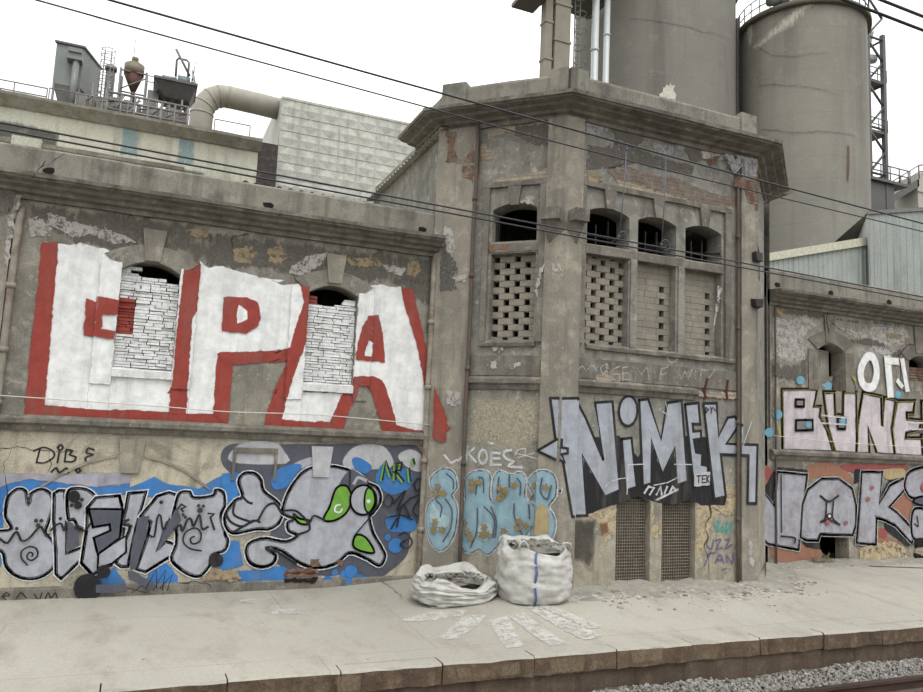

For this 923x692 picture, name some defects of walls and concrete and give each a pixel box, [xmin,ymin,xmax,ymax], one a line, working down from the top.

peeling [659,83,676,100]
flaking render [445,123,548,182]
peeling [585,122,758,211]
peeling [4,195,22,267]
peeling [28,204,136,244]
flaking render [233,245,327,276]
flaking render [347,257,421,278]
peeling [772,308,821,363]
peeling [838,326,909,356]